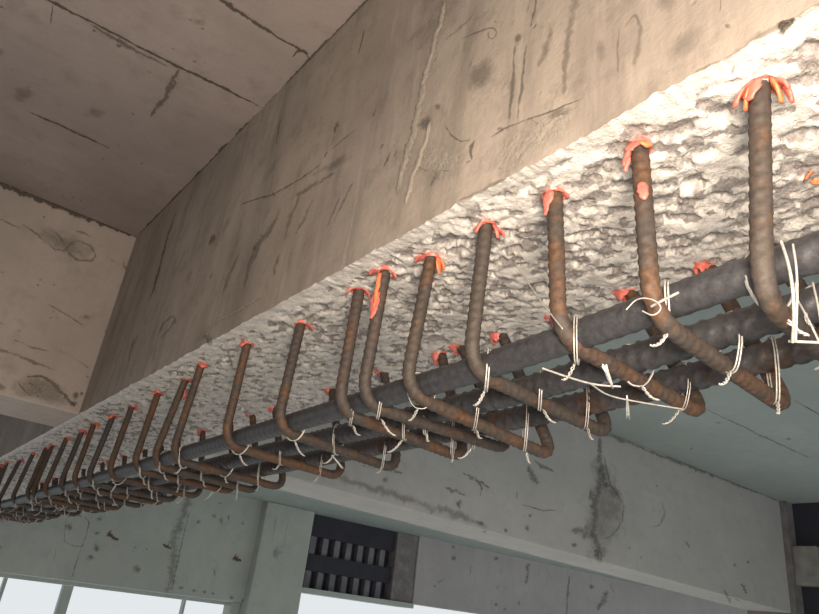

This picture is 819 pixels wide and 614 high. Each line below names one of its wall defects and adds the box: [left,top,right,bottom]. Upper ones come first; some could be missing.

spalling [779,18,795,33]
crack [151,70,179,116]
peeling [731,77,795,112]
crack [32,113,107,147]
peeling [622,140,653,172]
peeling [636,182,649,201]
peeling [364,268,397,319]
spalling [662,255,817,376]
spalling [774,230,819,333]
spalling [570,295,731,394]
spalling [416,328,655,431]
spalling [0,378,486,514]